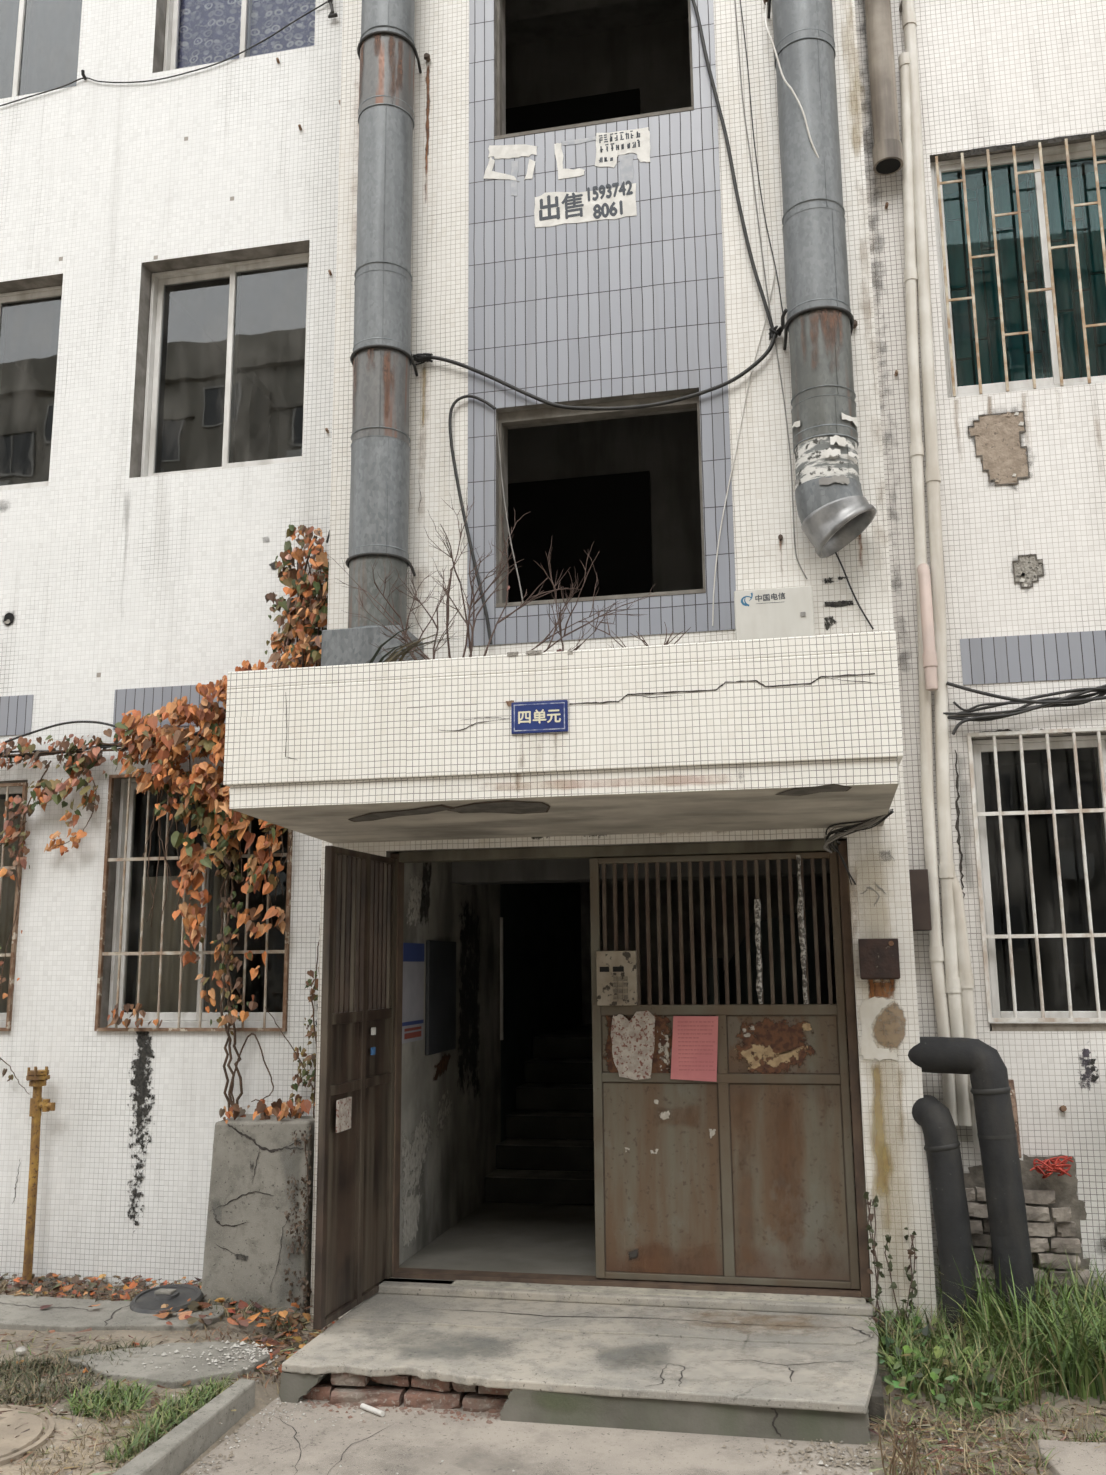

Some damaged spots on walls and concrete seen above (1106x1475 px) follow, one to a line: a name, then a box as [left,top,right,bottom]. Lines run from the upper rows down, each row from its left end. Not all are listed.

corrosion [359,34,403,98]
corrosion [801,310,843,355]
spalling [968,411,1030,488]
spalling [1012,554,1044,589]
crack [570,673,901,705]
crack [441,717,509,731]
flaking render [858,997,906,1061]
crack [212,1124,307,1289]
crack [649,1363,685,1387]
crack [722,1327,874,1437]